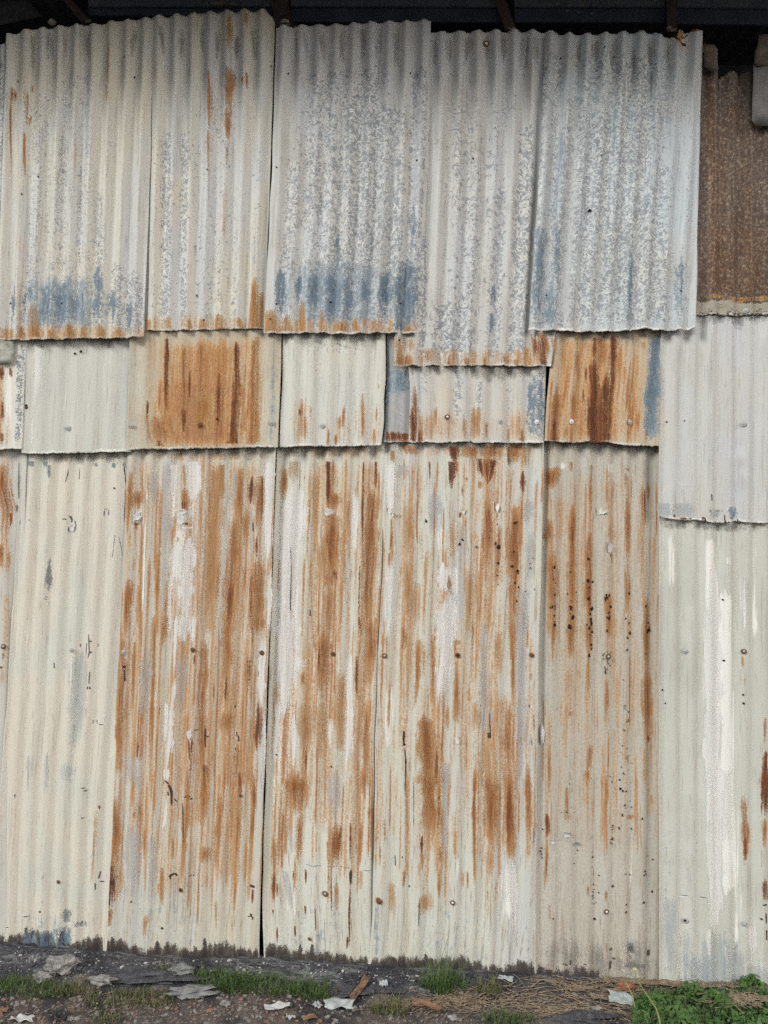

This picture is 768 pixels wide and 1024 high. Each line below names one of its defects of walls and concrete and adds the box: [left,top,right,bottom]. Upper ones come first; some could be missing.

rust [207,67,248,164]
rust [144,280,433,446]
rust [501,332,620,443]
water stain [23,909,86,946]
rust [108,798,123,925]
rust [115,495,168,768]
rust [181,465,266,929]
rust [271,461,434,946]
rust [405,663,481,870]
rust [448,408,550,888]
rust [543,505,593,697]
rust [640,603,653,777]